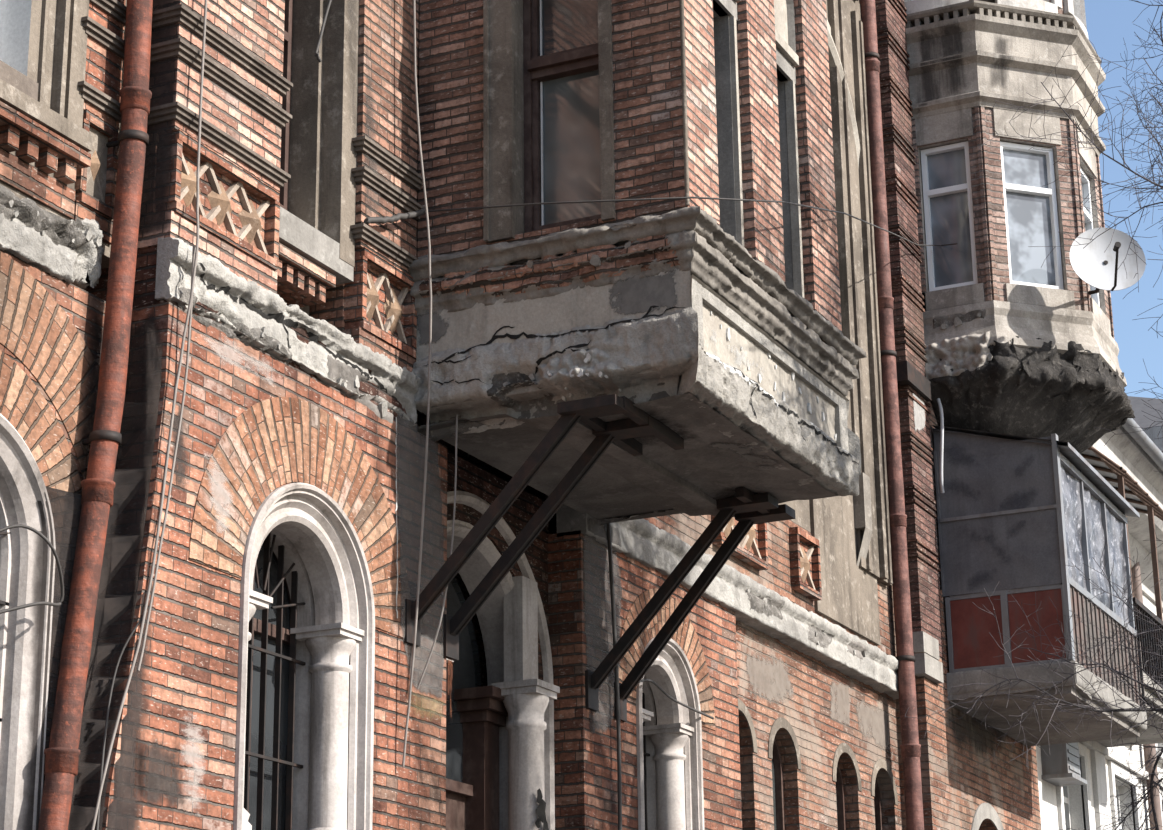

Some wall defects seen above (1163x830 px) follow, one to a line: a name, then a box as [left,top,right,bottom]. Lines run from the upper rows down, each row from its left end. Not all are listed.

spalling [0,185,105,288]
spalling [177,287,292,361]
spalling [327,355,394,424]
crack [425,306,685,385]
spalling [487,348,632,412]
peeling [706,311,852,456]
spalling [924,309,993,380]